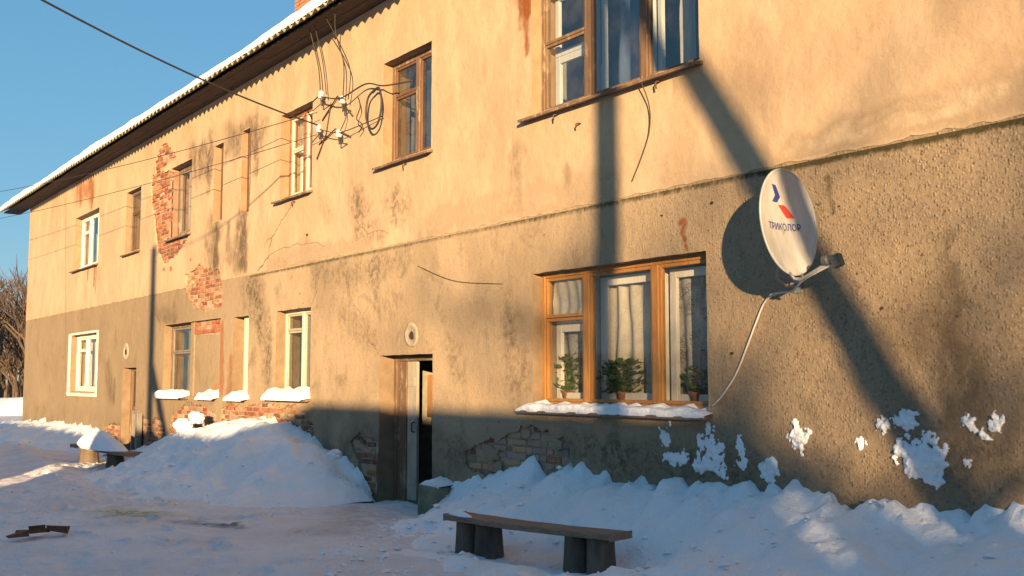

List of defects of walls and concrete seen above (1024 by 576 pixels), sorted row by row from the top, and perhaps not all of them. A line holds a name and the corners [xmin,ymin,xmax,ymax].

rust [519,0,531,54]
flaking render [152,143,223,335]
flaking render [141,402,314,446]
flaking render [352,433,378,495]
flaking render [467,425,572,476]